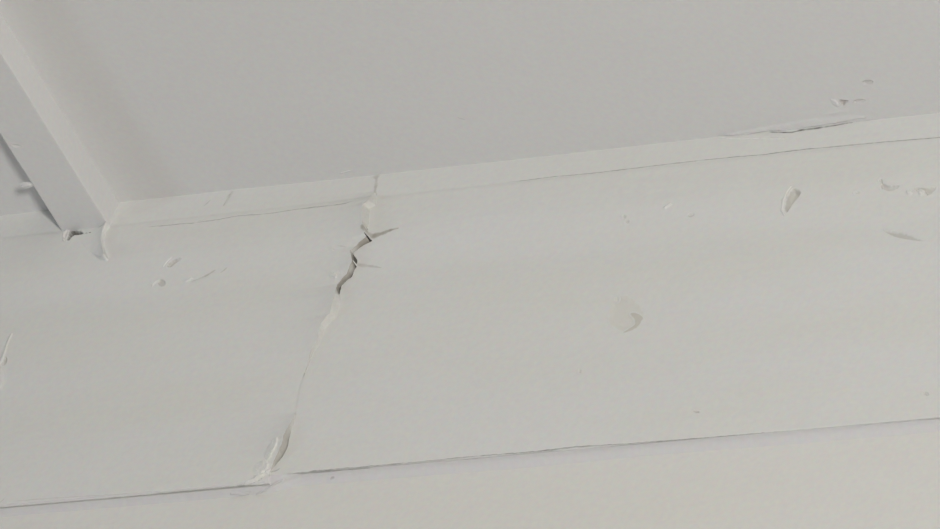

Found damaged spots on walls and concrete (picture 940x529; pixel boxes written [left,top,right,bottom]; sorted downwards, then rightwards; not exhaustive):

peeling [62,230,91,242]
crack [150,174,399,373]